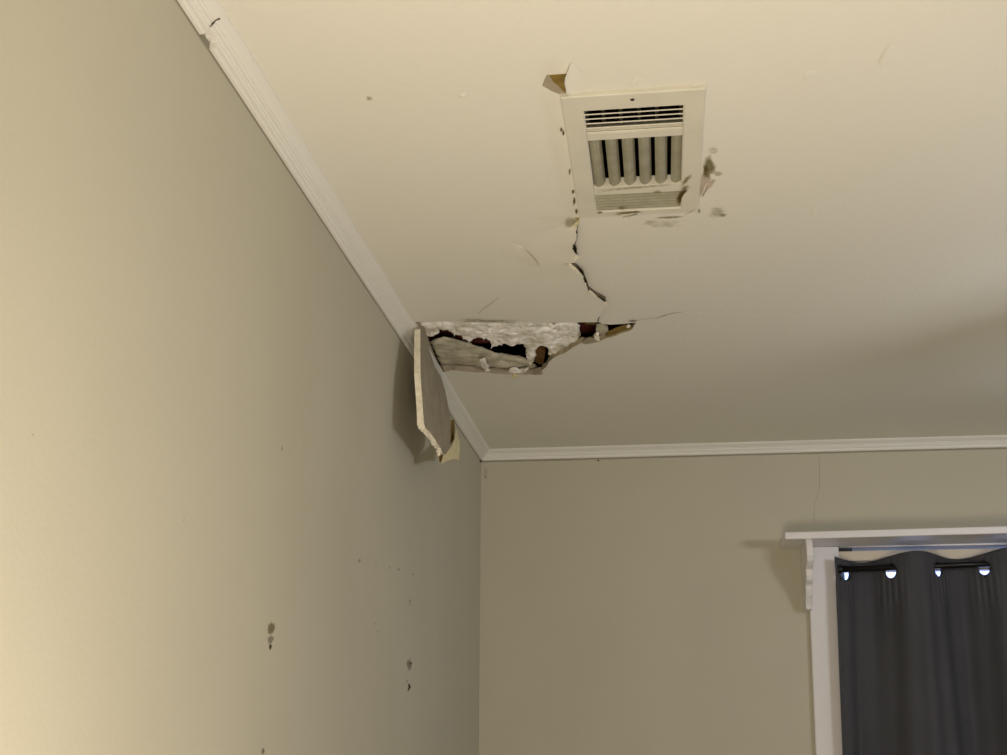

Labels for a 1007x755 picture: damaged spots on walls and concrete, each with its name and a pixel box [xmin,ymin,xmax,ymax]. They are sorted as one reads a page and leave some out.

peeling [542,63,584,96]
crack [568,226,607,321]